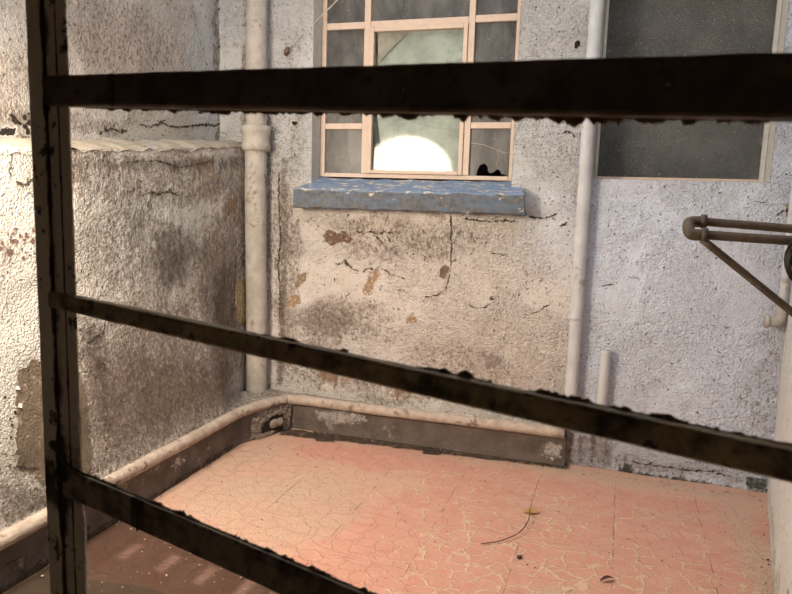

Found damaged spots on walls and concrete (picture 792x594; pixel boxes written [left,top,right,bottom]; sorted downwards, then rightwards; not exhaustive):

crack [99,112,220,135]
peeling [323,228,353,246]
crack [356,231,393,245]
peeling [286,271,309,307]
crack [336,259,404,279]
peeling [363,268,381,296]
crack [425,213,567,298]
peeling [3,359,45,485]
peeling [79,377,93,475]